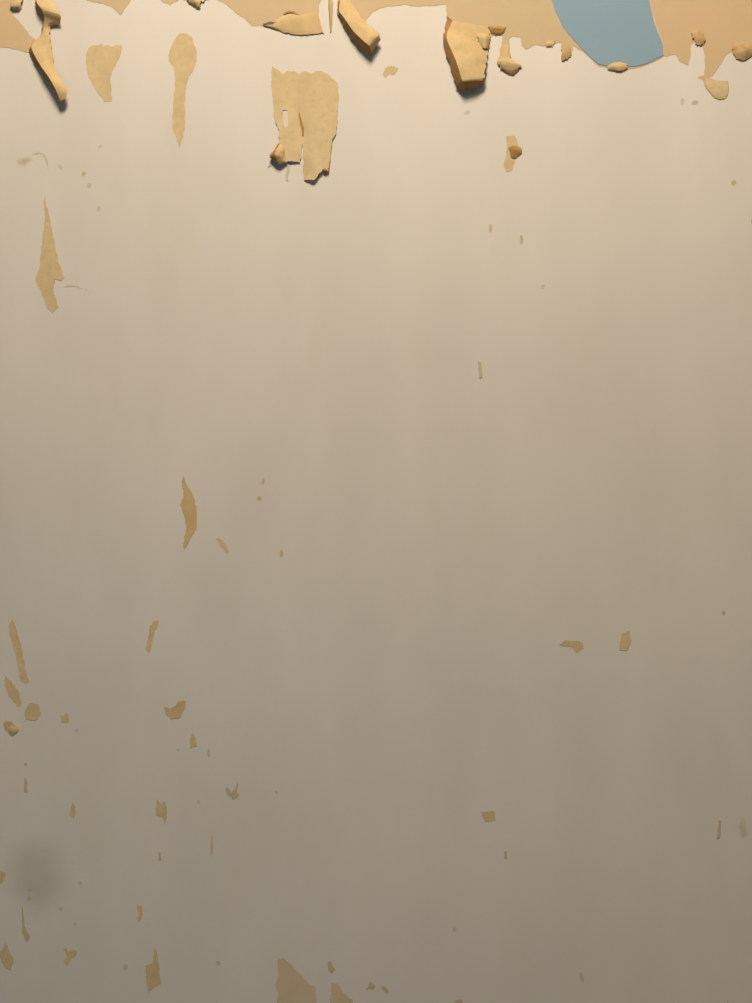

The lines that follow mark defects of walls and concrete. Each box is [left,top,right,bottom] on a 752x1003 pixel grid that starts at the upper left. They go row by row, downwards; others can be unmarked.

peeling [607,62,628,71]